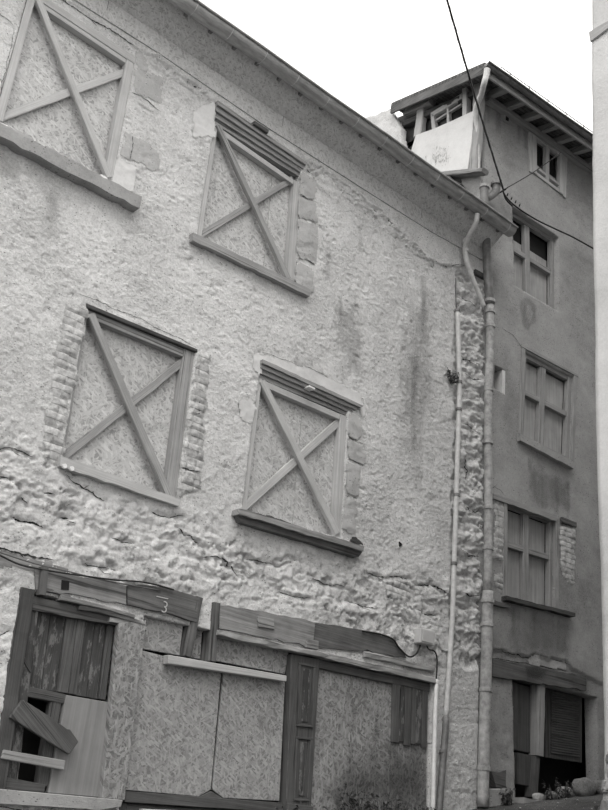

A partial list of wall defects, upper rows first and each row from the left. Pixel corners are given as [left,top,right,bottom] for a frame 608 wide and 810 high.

flaking render [120,132,160,172]
flaking render [43,303,90,461]
flaking render [176,352,212,499]
crack [12,497,43,528]
crack [0,547,53,560]
crack [152,512,271,574]
crack [280,579,373,610]
crack [368,573,479,597]